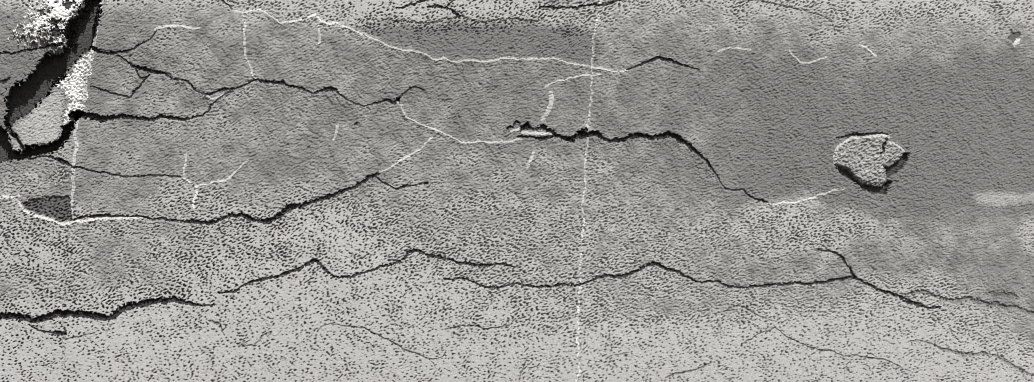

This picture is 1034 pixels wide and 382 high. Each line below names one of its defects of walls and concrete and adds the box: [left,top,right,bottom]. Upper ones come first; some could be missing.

crack [0,42,64,55]
crack [27,153,249,208]
crack [68,0,1034,316]
crack [0,248,515,340]